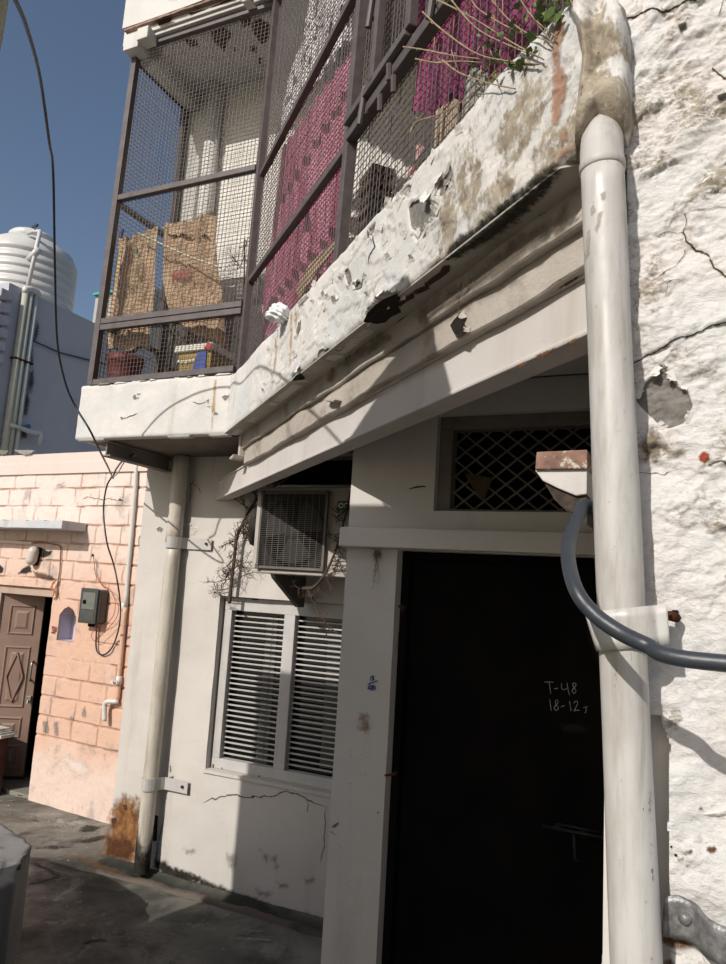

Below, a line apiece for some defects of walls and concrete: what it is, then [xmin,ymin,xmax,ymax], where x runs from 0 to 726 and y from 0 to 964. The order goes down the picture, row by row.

peeling [211,28,236,51]
peeling [241,17,270,64]
crack [627,0,697,19]
flaking render [355,165,453,263]
damp [445,161,560,260]
crack [653,206,726,291]
spalling [450,310,470,336]
crack [633,322,726,363]
flaking render [635,362,693,430]
crack [203,790,327,857]
damp [133,828,262,902]
corrosion [662,937,693,948]